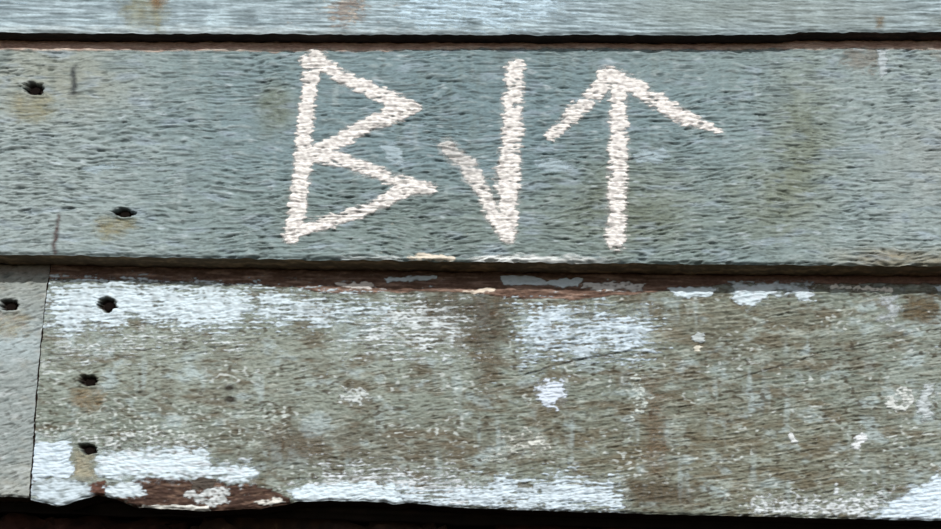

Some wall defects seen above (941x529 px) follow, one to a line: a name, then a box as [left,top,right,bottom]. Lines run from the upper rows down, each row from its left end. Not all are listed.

spalling [344,253,455,262]
spalling [475,255,590,264]
peeling [668,286,717,299]
peeling [728,281,817,306]
peeling [830,284,898,320]
peeling [43,274,673,420]
peeling [691,332,705,351]
peeling [884,384,934,420]
peeling [851,433,868,449]
peeling [31,425,625,513]
peeling [740,474,941,521]